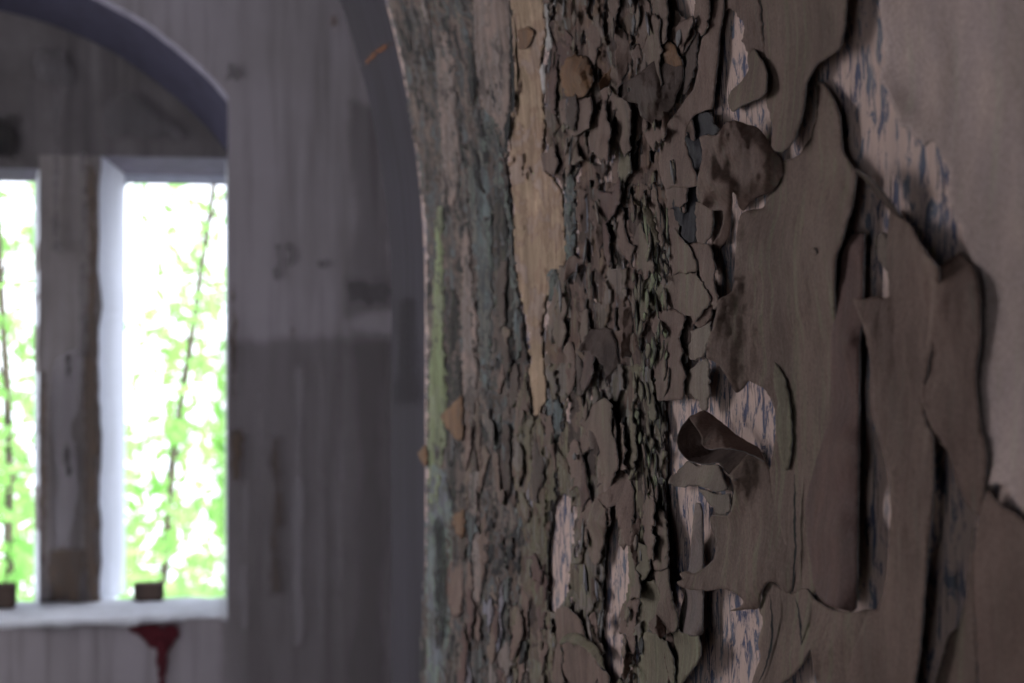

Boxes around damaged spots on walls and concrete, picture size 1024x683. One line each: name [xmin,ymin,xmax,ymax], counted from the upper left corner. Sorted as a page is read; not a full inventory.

peeling [387,0,1024,683]